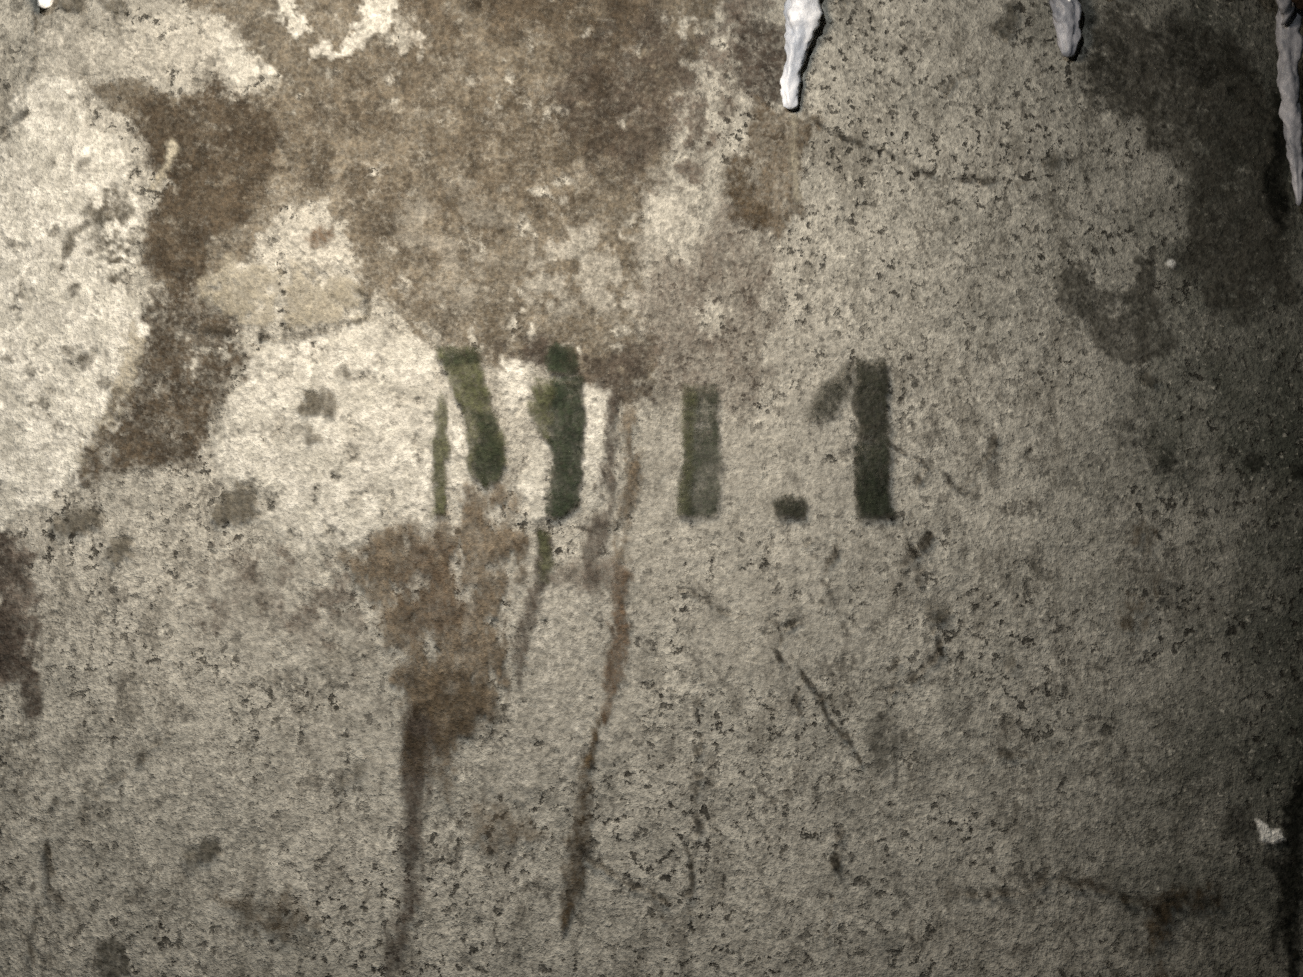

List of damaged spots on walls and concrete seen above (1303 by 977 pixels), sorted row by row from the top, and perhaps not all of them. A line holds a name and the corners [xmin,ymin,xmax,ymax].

leakage [89,0,820,480]
leakage [0,531,42,718]
corrosion [342,482,554,977]
corrosion [561,396,640,928]